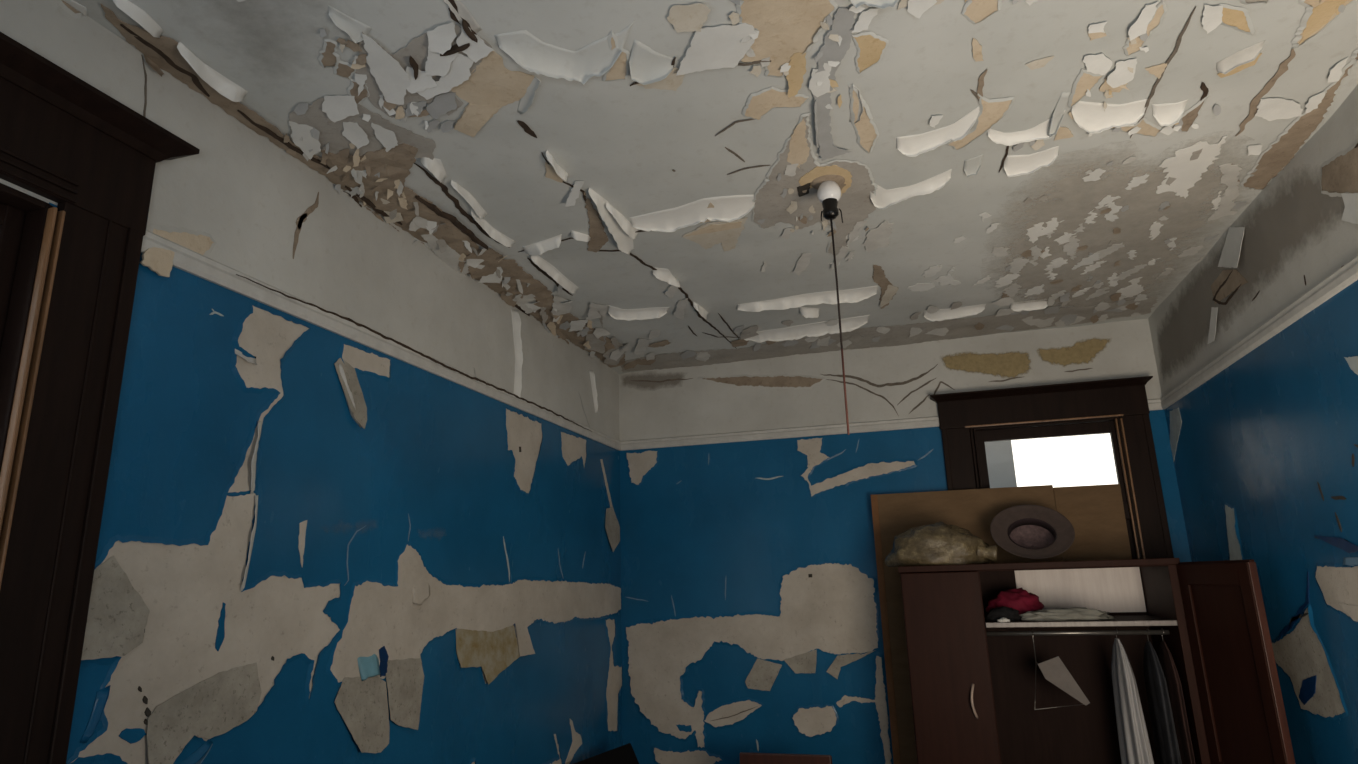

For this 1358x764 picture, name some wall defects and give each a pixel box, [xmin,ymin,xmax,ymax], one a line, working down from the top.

crack [293,192,319,259]
peeling [56,0,1358,413]
crack [236,274,592,432]